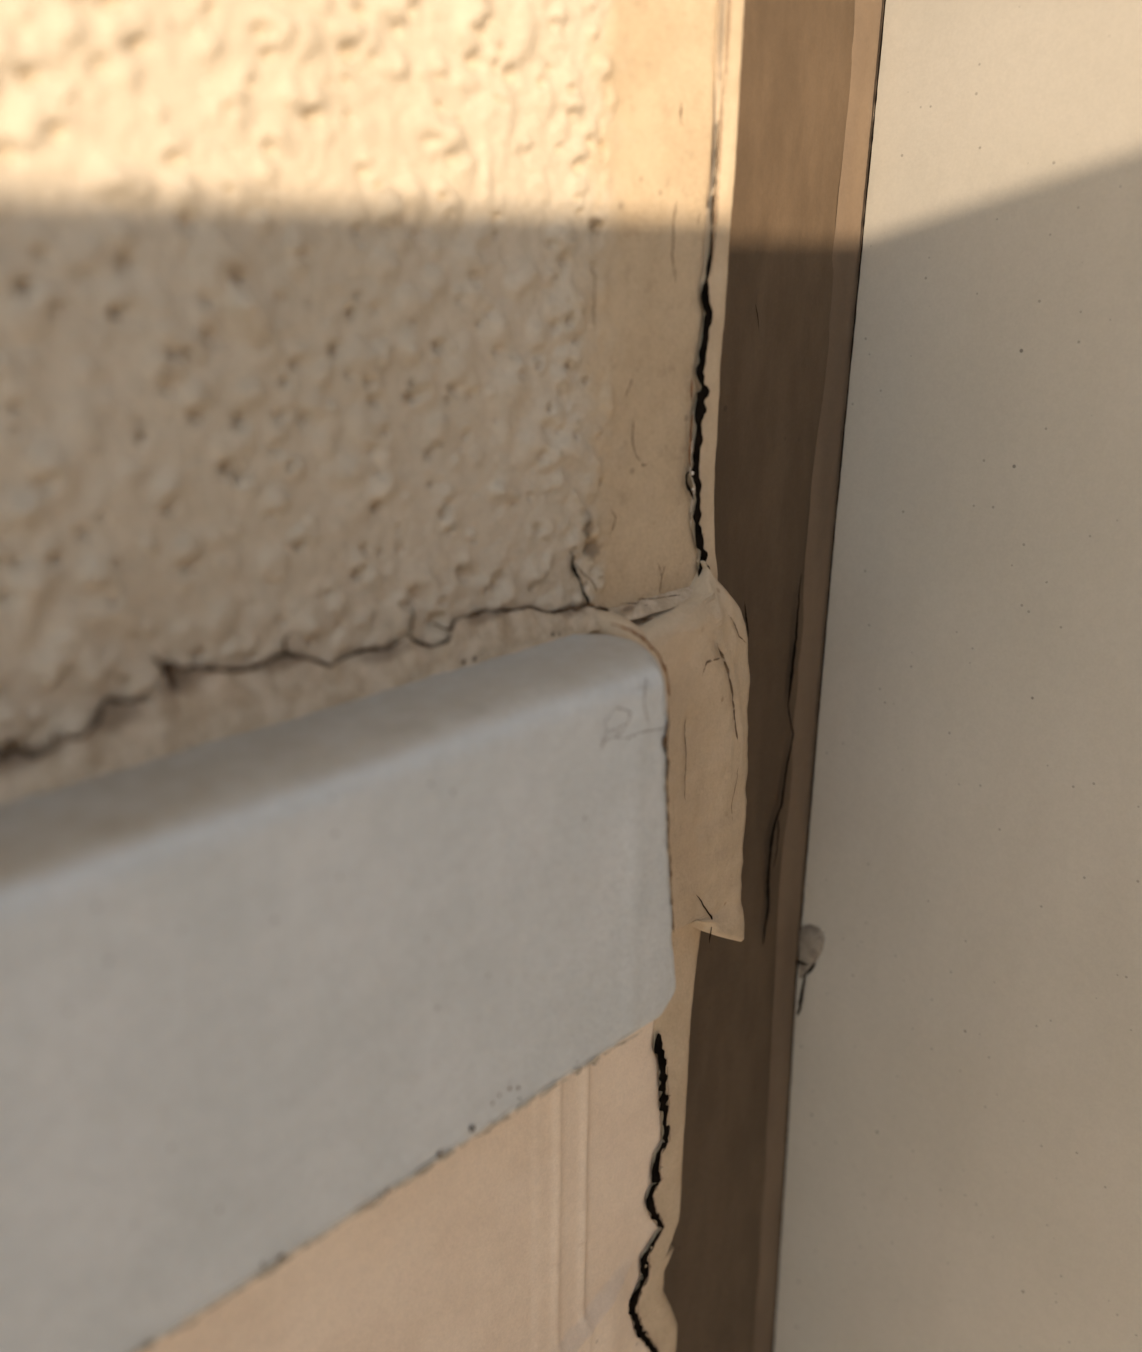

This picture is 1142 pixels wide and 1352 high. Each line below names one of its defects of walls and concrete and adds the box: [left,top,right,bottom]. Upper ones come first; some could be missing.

crack [0,123,718,943]
crack [703,607,749,821]
crack [629,1033,671,1352]